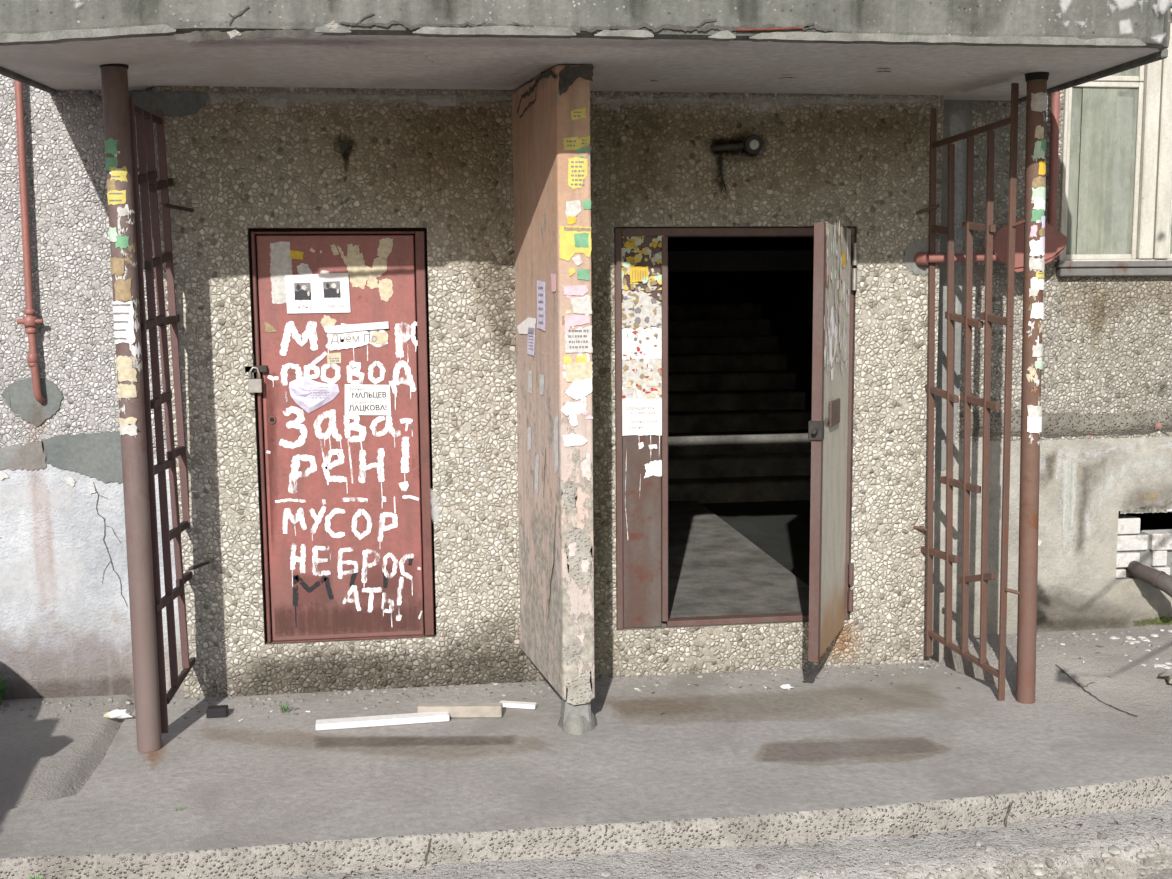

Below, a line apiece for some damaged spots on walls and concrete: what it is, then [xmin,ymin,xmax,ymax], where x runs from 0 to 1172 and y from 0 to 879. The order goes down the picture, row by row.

crack [93,482,128,607]
peeling [561,459,592,512]
peeling [565,528,593,589]
leakage [1062,446,1116,549]
spalling [1120,505,1172,514]
spalling [562,634,592,705]